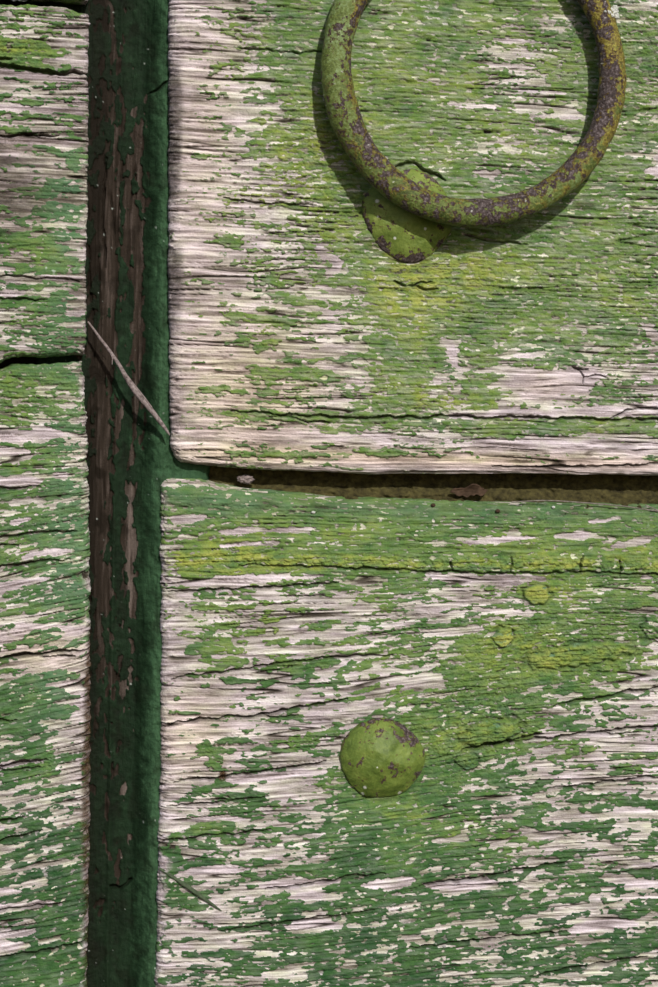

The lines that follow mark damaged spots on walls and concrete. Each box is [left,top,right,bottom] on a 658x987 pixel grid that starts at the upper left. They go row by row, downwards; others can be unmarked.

peeling [0,5,89,48]
peeling [0,68,89,349]
peeling [88,120,145,327]
peeling [168,0,658,474]
peeling [0,355,139,695]
peeling [161,513,339,553]
peeling [160,570,344,798]
peeling [415,573,524,631]
peeling [443,510,540,553]
peeling [545,511,655,555]
peeling [0,823,22,871]
peeling [155,681,658,987]